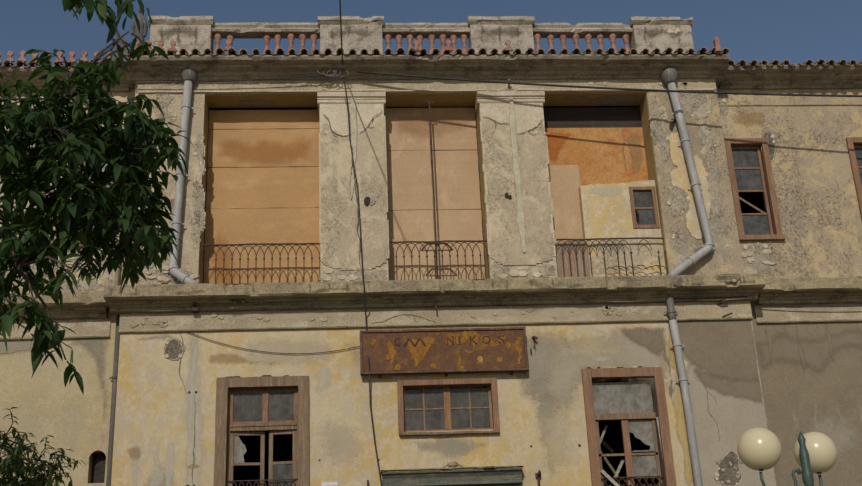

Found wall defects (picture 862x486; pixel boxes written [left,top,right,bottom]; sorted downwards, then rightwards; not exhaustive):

flaking render [153,81,234,128]
flaking render [5,247,125,292]
flaking render [137,146,200,285]
flaking render [191,132,206,249]
crack [323,97,383,266]
flaking render [480,116,556,279]
peeling [588,106,711,274]
flaking render [715,241,776,283]
water stain [525,320,776,486]
flaking render [714,450,743,486]